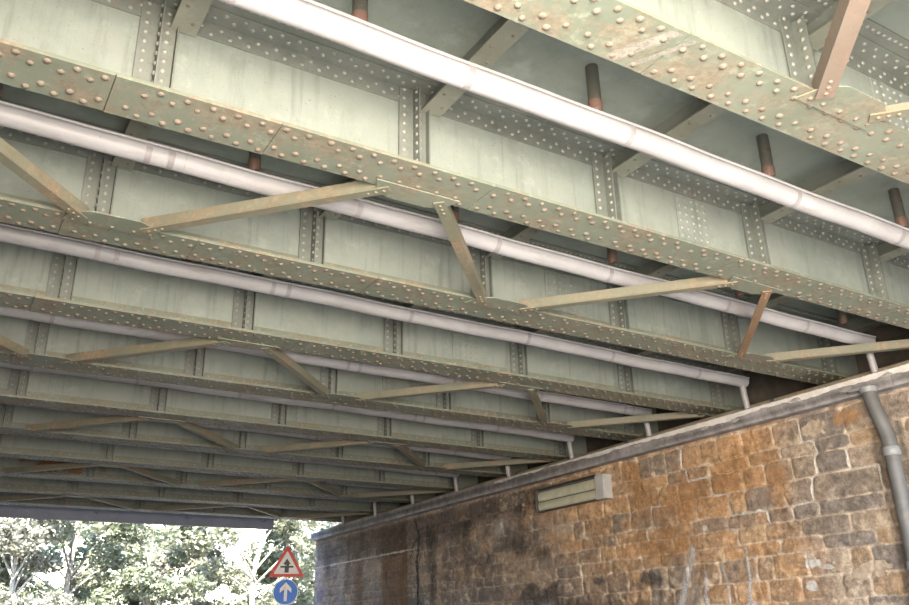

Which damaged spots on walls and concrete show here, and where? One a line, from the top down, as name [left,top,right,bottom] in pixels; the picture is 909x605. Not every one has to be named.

crack [410,518,422,605]
damp [640,572,661,585]